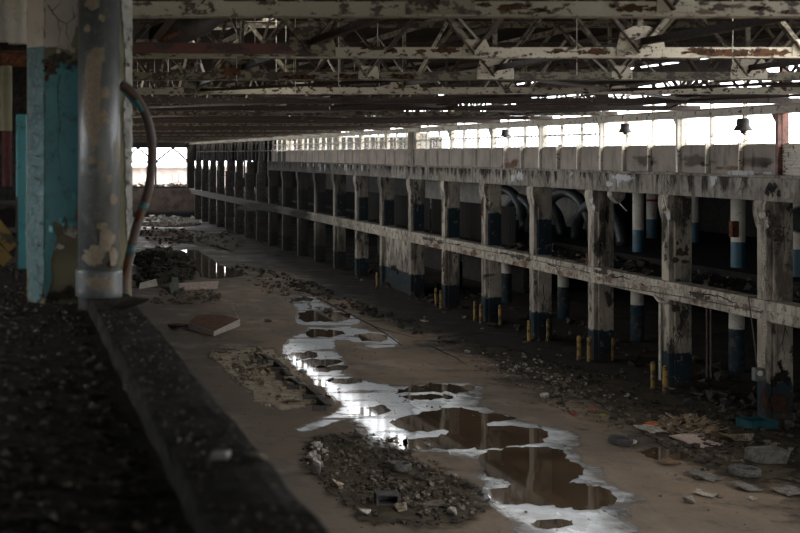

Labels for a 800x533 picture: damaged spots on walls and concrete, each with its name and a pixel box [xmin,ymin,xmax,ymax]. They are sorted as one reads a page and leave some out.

rust [477,2,551,13]
rust [608,3,657,12]
rust [727,4,790,14]
rust [682,47,792,57]
peeling [26,0,113,303]
spalling [607,191,627,211]
spalling [662,211,689,264]
peeling [82,222,129,274]